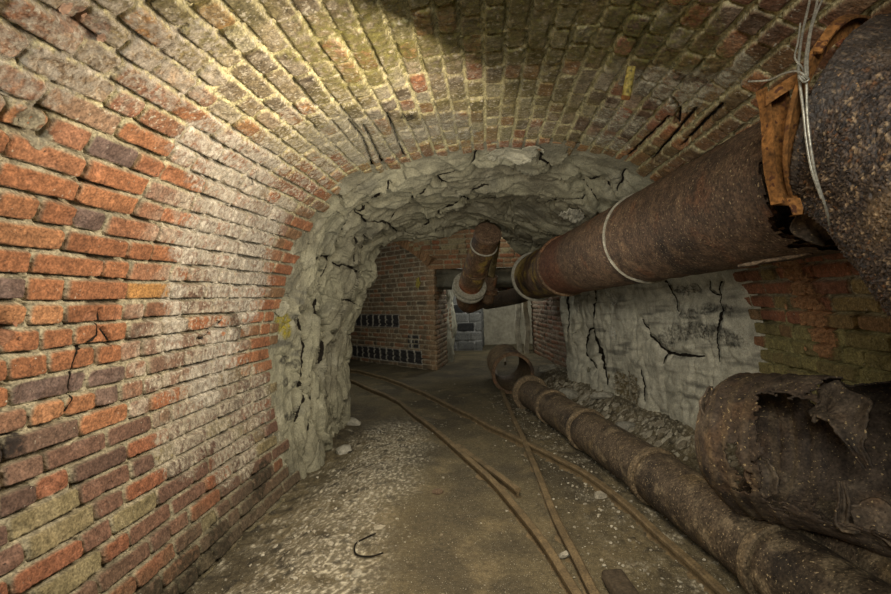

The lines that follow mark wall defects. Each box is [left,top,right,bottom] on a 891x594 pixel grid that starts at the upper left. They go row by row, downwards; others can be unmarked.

crack [411,150,513,225]
crack [293,112,403,431]
crack [63,313,109,411]
crack [566,290,609,385]
crack [642,281,725,362]